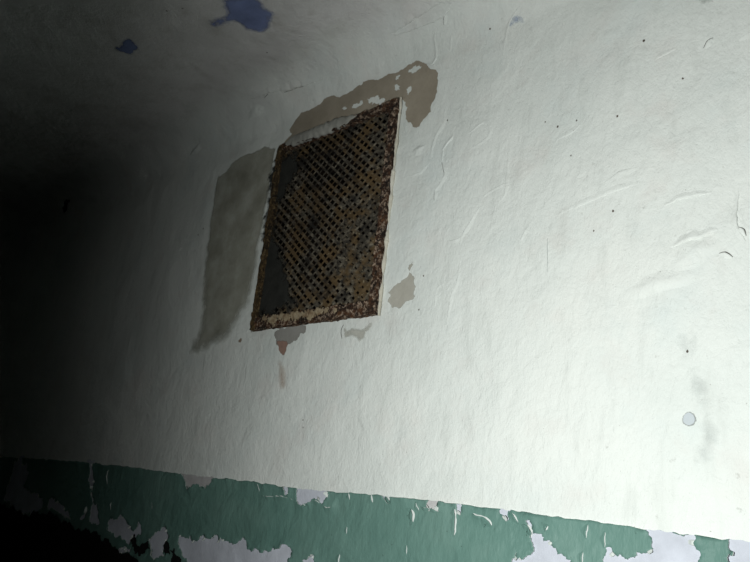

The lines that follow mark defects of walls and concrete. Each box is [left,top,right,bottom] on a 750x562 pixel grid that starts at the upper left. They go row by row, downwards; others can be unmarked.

flaking render [194,61,438,355]
peeling [80,459,141,554]
peeling [284,486,328,506]
peeling [149,527,168,559]
peeling [178,535,292,562]
peeling [512,520,571,562]
peeling [603,530,701,562]
peeling [727,539,750,562]